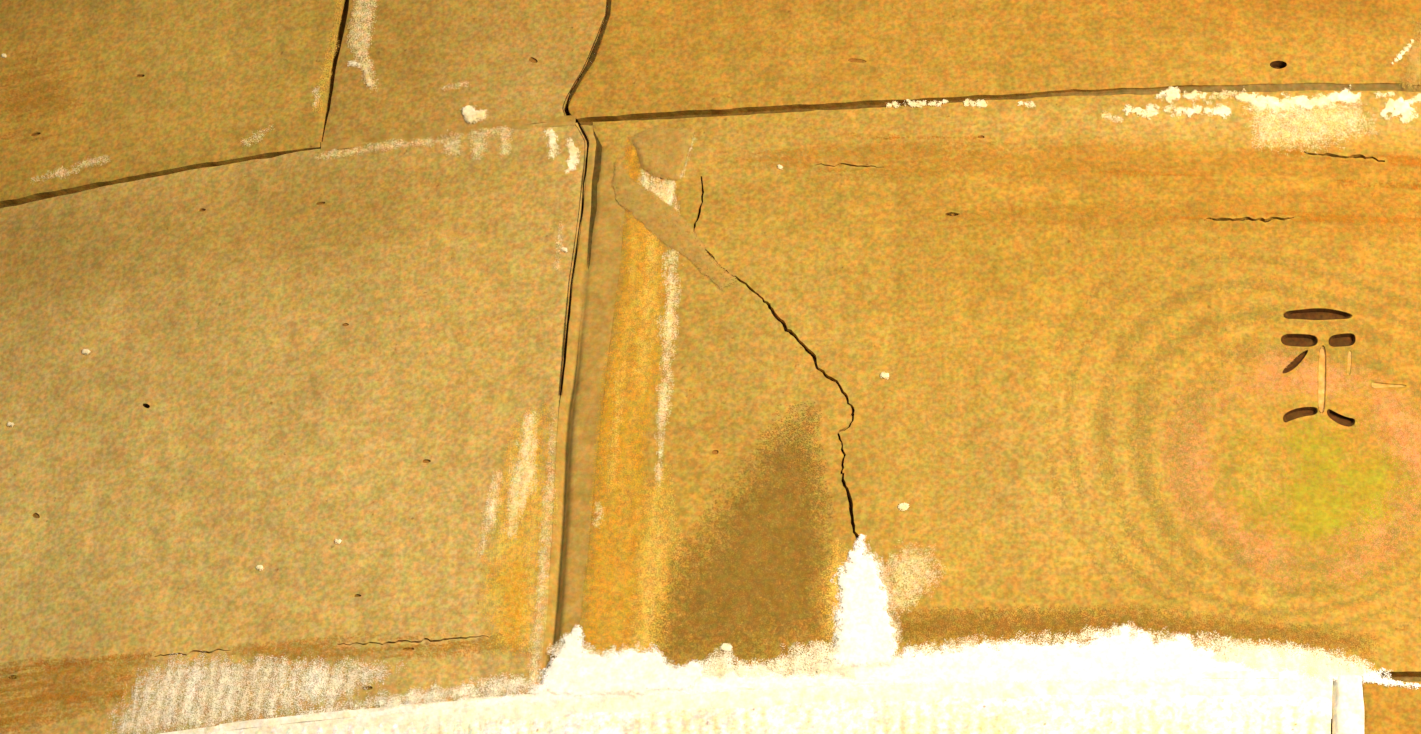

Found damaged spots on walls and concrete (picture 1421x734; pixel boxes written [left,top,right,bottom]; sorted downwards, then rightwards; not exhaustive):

leakage [583,136,839,668]
crack [693,179,863,555]
leakage [888,235,1421,662]